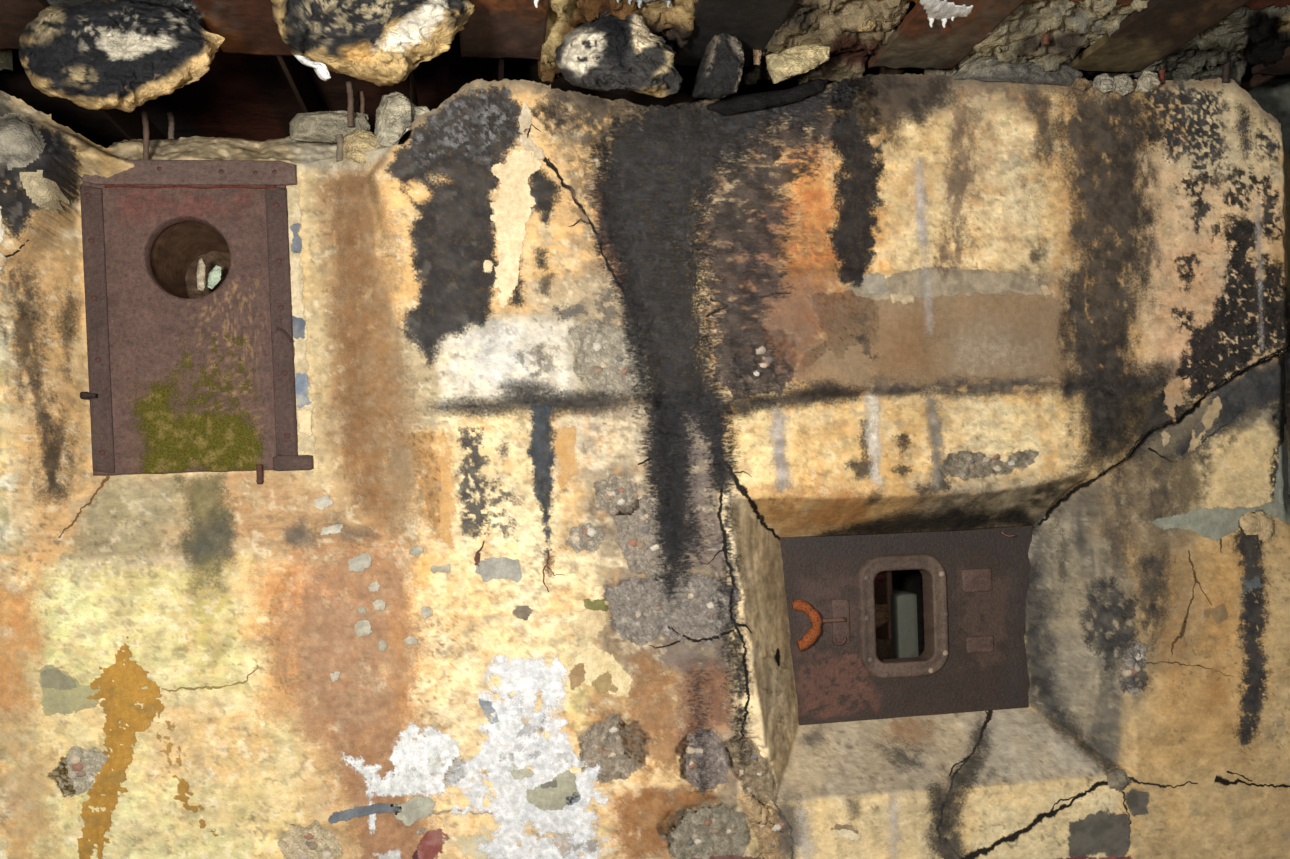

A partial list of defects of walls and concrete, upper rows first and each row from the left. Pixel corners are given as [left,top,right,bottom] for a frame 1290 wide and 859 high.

leakage [0,92,84,239]
crack [527,124,639,339]
crack [706,292,791,317]
leakage [384,73,1290,795]
crack [1037,345,1290,526]
crack [542,552,562,592]
crack [648,463,780,741]
crack [949,710,993,789]
peeling [373,850,401,859]
peeling [393,796,435,826]
crack [936,771,1290,859]